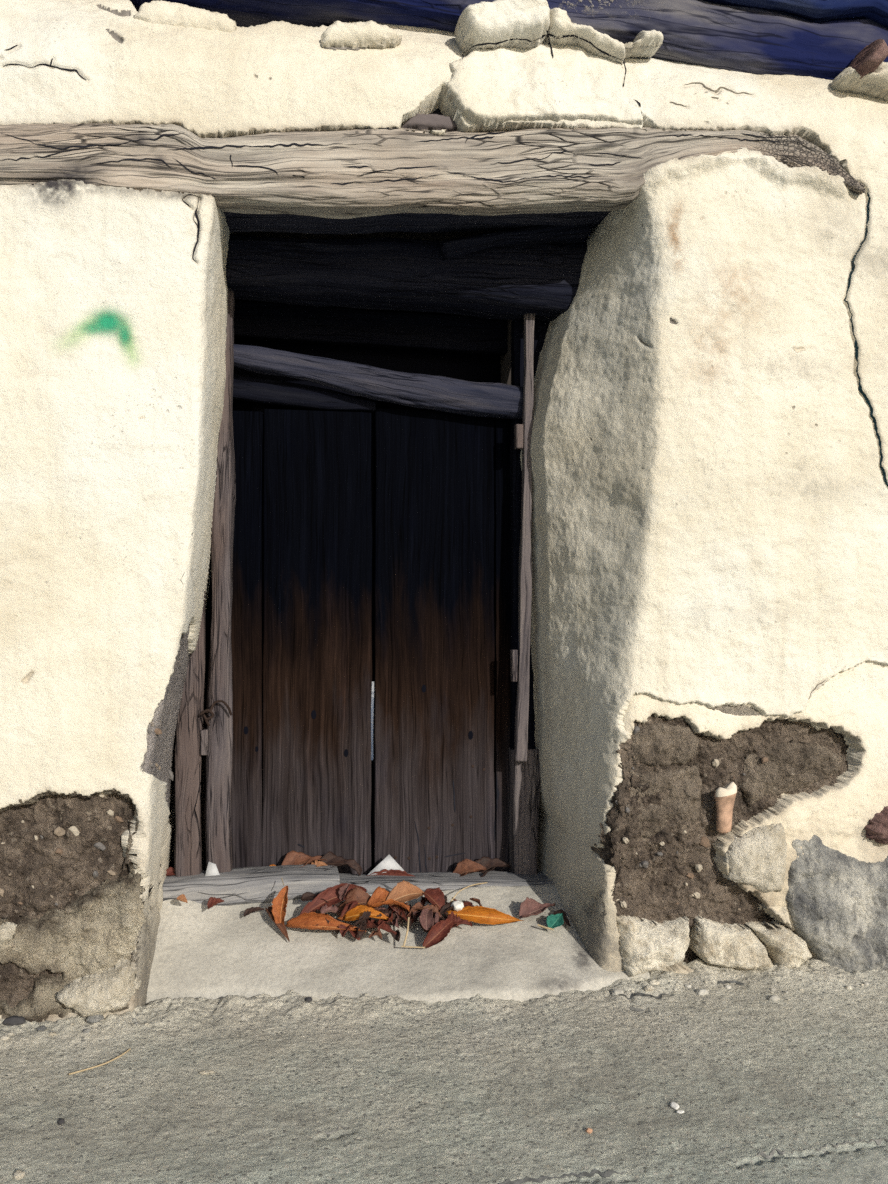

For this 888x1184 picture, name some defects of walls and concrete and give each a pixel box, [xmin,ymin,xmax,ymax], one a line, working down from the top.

crack [4,45,86,80]
crack [1,128,644,262]
crack [462,30,642,112]
crack [664,82,790,142]
crack [844,182,888,487]
spalling [0,788,146,1023]
spalling [140,624,190,819]
spalling [591,661,888,962]